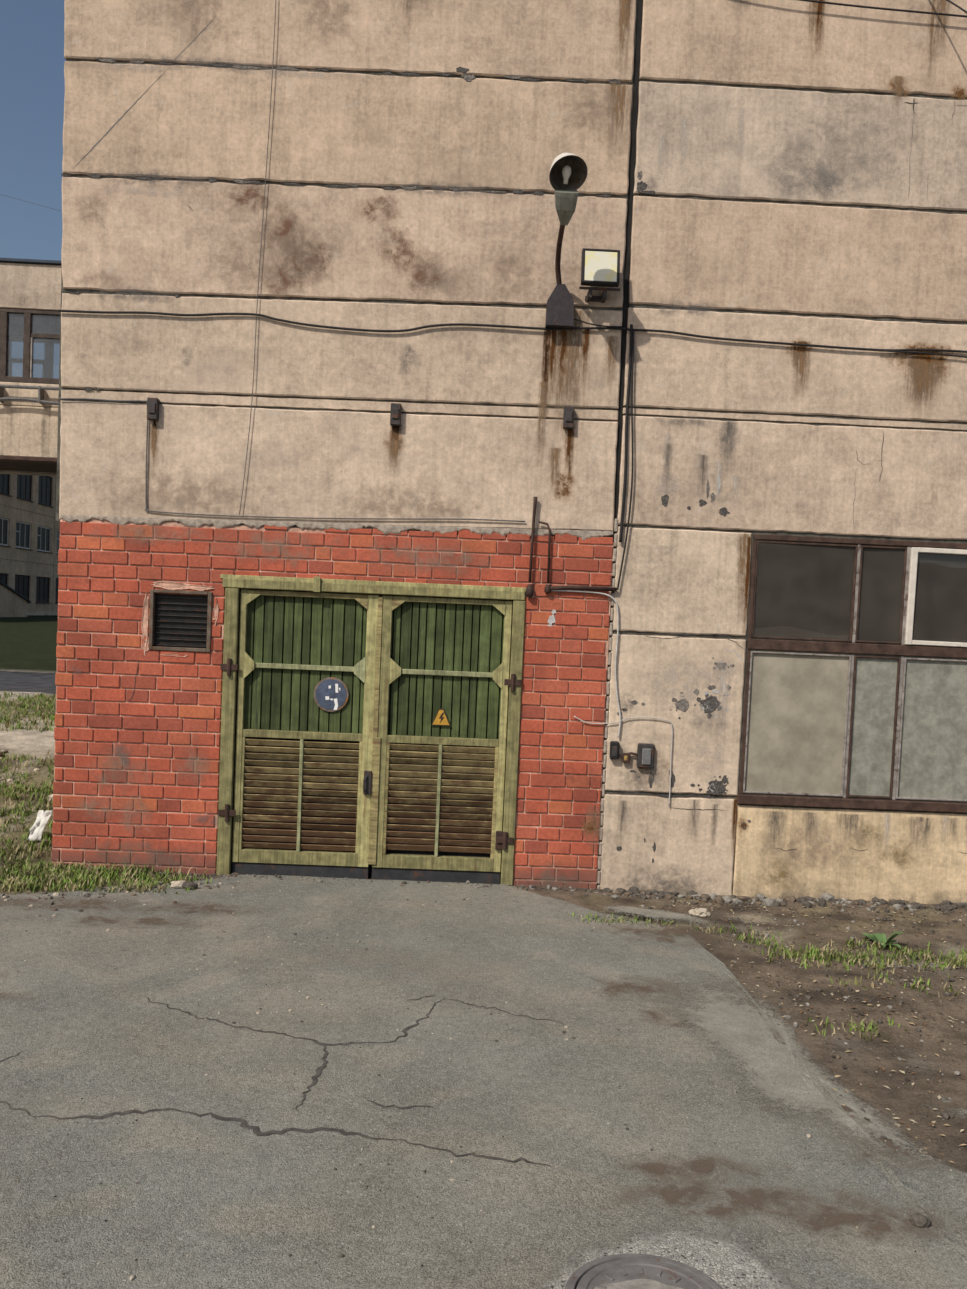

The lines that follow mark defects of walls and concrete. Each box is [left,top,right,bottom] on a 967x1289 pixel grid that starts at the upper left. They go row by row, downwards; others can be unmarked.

corrosion [809,0,825,41]
damp [235,186,266,208]
damp [364,196,391,219]
damp [270,216,325,294]
damp [384,232,440,286]
corrosion [791,341,810,386]
corrosion [895,343,950,398]
corrosion [538,308,589,497]
corrosion [387,426,402,465]
spalling [670,657,735,719]
spalling [630,770,675,788]
spalling [691,775,728,798]